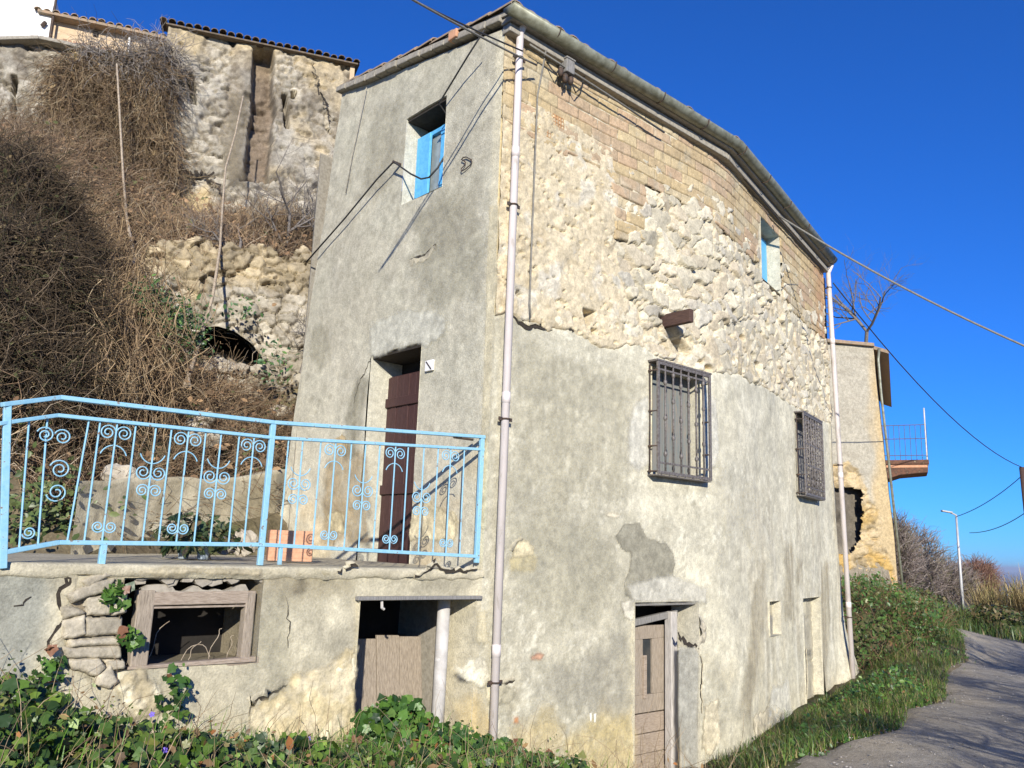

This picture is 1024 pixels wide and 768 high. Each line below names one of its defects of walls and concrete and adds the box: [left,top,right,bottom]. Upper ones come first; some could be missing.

spalling [513,540,534,557]
flaking render [60,567,263,719]
peeling [250,648,358,758]
crack [697,648,705,714]